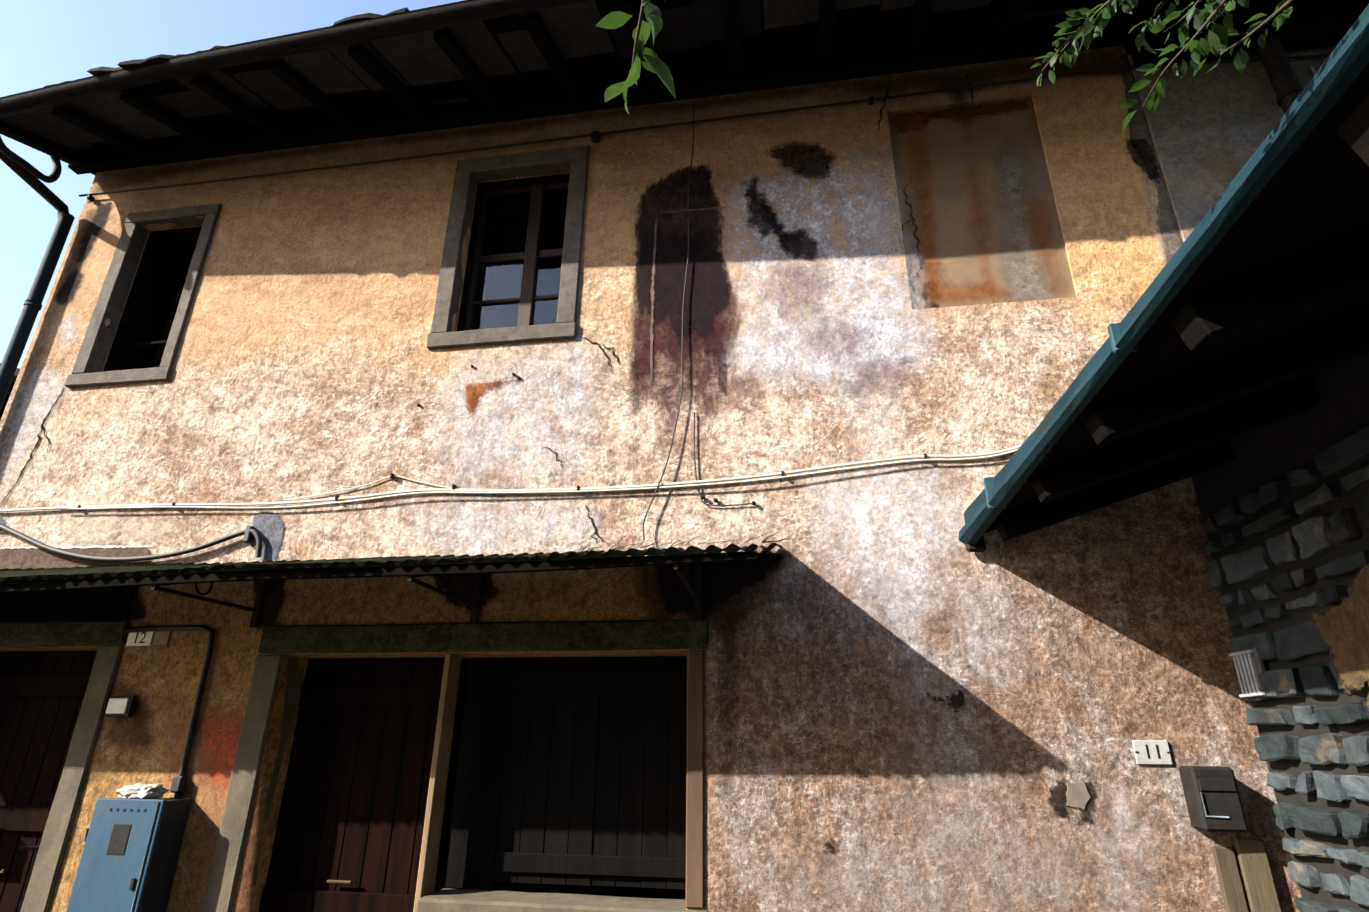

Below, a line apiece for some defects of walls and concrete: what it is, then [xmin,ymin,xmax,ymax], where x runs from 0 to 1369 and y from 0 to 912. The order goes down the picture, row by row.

rust [892,99,1029,133]
leakage [56,49,1122,305]
leakage [631,164,917,411]
crack [1,388,64,504]
flaking render [1048,779,1098,825]